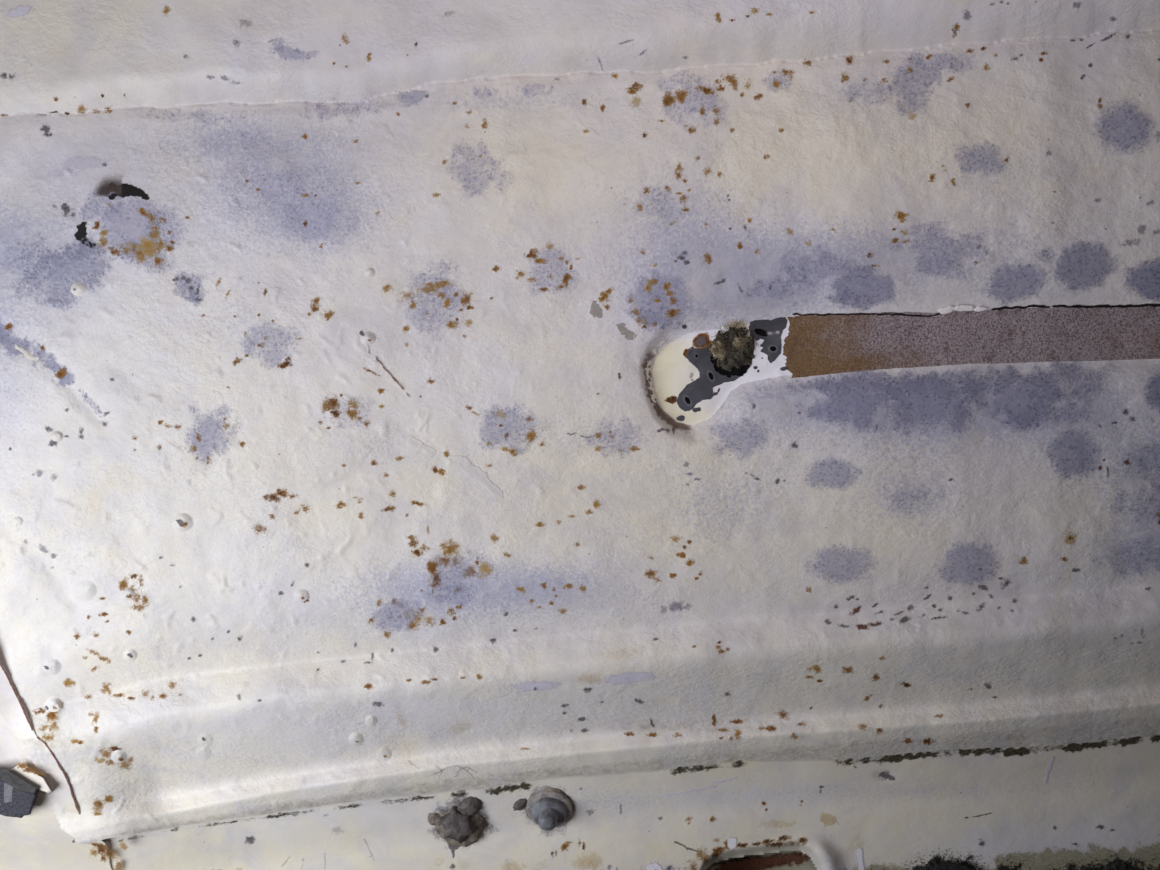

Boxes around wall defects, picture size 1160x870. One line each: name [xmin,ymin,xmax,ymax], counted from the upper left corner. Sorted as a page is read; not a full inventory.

corrosion [663,75,763,106]
corrosion [773,61,811,88]
peeling [10,193,179,308]
corrosion [92,208,175,265]
peeling [589,301,602,318]
peeling [739,250,896,309]
peeling [0,325,74,385]
peeling [616,274,793,453]
corrosion [783,305,1160,378]
peeling [798,362,1109,478]
corrosion [369,527,491,638]
mould [845,843,1160,870]